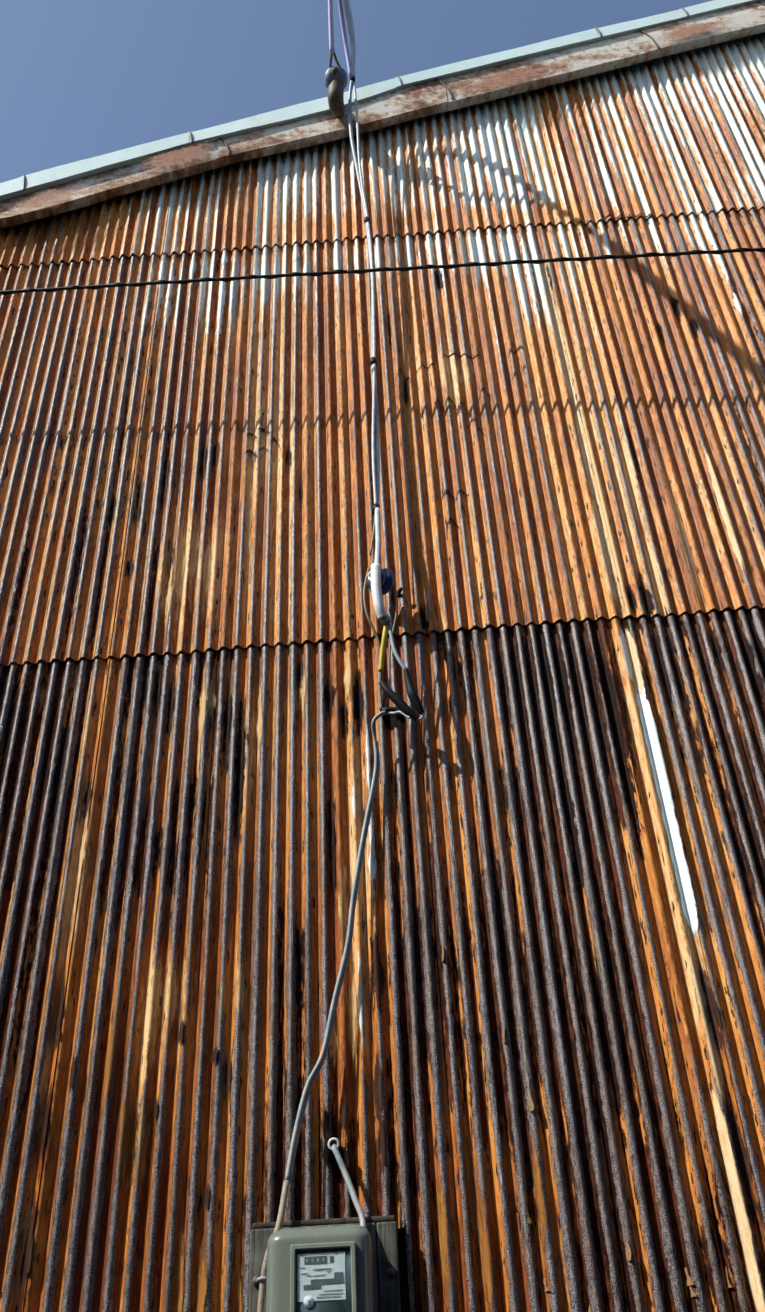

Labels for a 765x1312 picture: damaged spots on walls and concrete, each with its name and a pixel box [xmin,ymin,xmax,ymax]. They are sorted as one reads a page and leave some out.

corrosion [461,61,572,92]
corrosion [11,188,89,211]
corrosion [144,144,210,170]
corrosion [370,931,385,1015]
corrosion [697,953,725,1061]
corrosion [103,1005,158,1201]
corrosion [171,1234,207,1312]
corrosion [230,1281,242,1312]
corrosion [438,1185,450,1297]
corrosion [462,1124,493,1311]
corrosion [533,1137,566,1312]
corrosion [723,1078,765,1297]